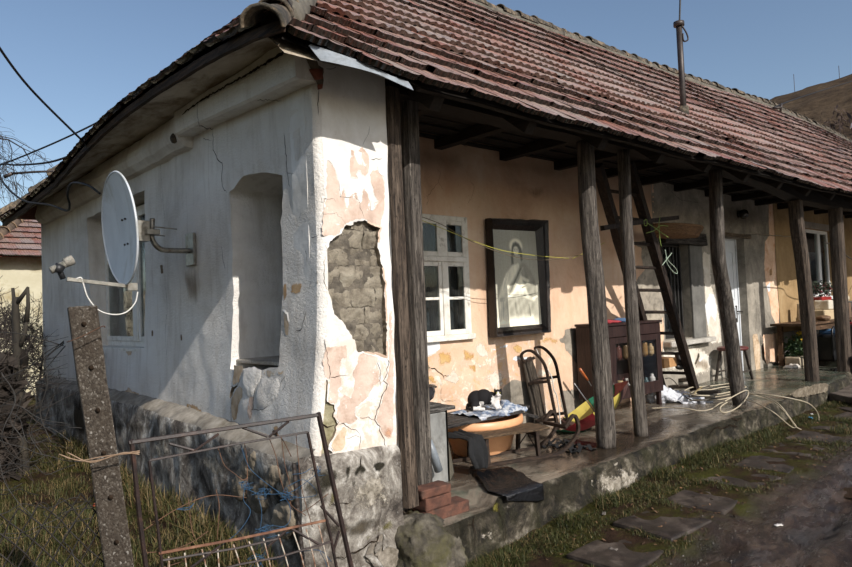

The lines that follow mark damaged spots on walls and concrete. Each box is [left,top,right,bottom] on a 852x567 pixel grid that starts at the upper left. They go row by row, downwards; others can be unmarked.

crack [182,51,284,191]
spalling [315,147,394,455]
spalling [230,365,253,420]
crack [329,364,389,466]
peeling [427,342,459,385]
damp [545,473,582,504]
damp [586,420,670,494]